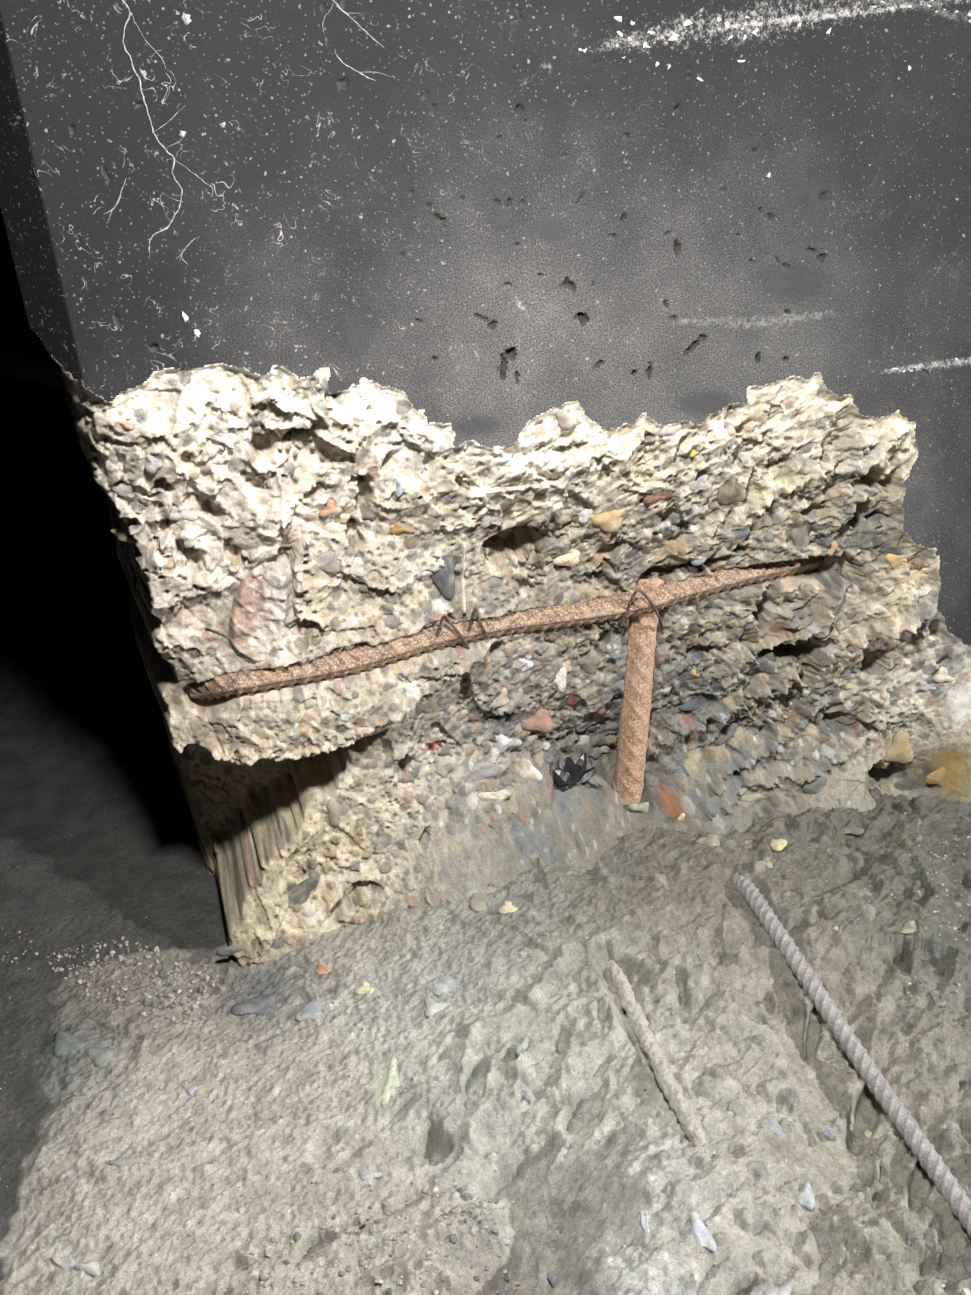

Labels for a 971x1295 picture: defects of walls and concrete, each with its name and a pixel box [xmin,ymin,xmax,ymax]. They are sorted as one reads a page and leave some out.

spalling [0,327,971,1295]